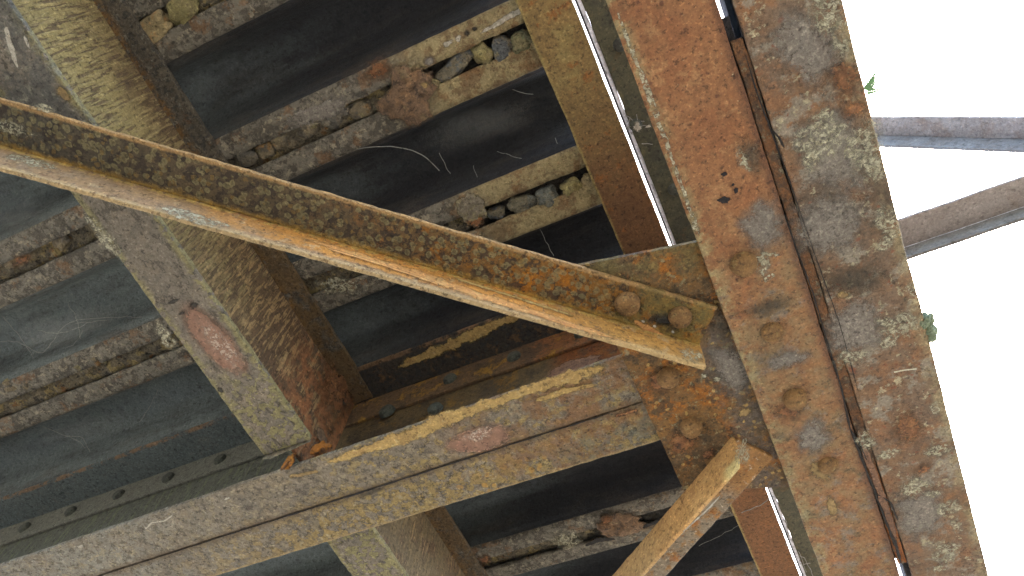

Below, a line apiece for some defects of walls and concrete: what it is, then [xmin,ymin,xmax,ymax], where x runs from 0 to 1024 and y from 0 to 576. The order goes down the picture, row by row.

rust [827,59,866,117]
rust [310,240,613,367]
rust [634,320,674,336]
rust [310,440,332,457]
peeling [289,365,604,478]